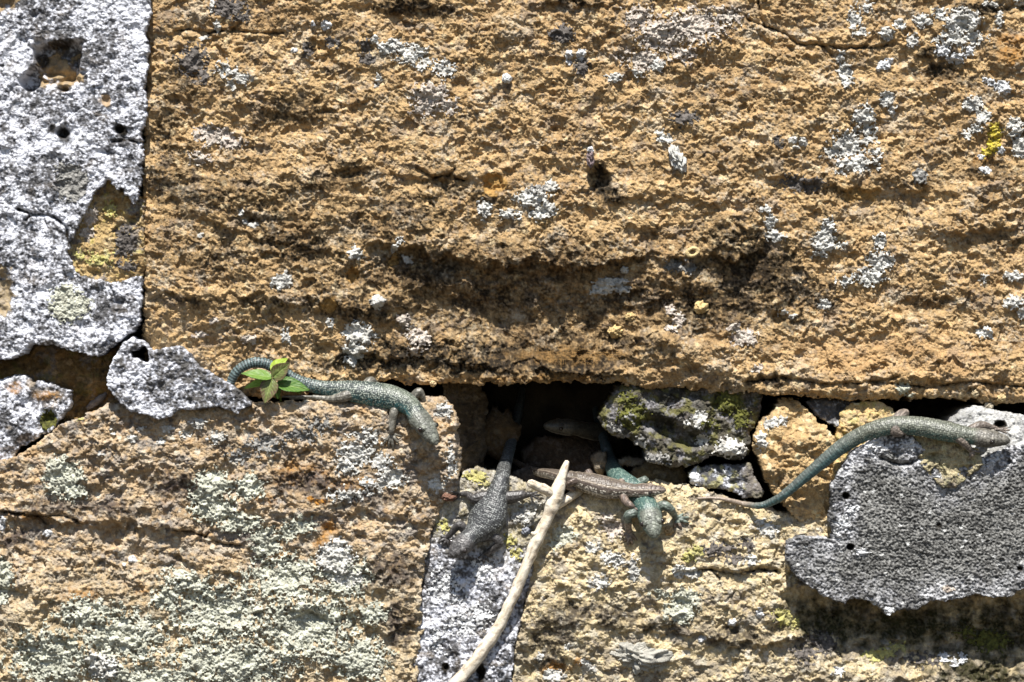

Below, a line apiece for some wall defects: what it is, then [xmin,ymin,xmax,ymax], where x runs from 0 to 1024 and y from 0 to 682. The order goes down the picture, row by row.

crack [6,511,81,524]